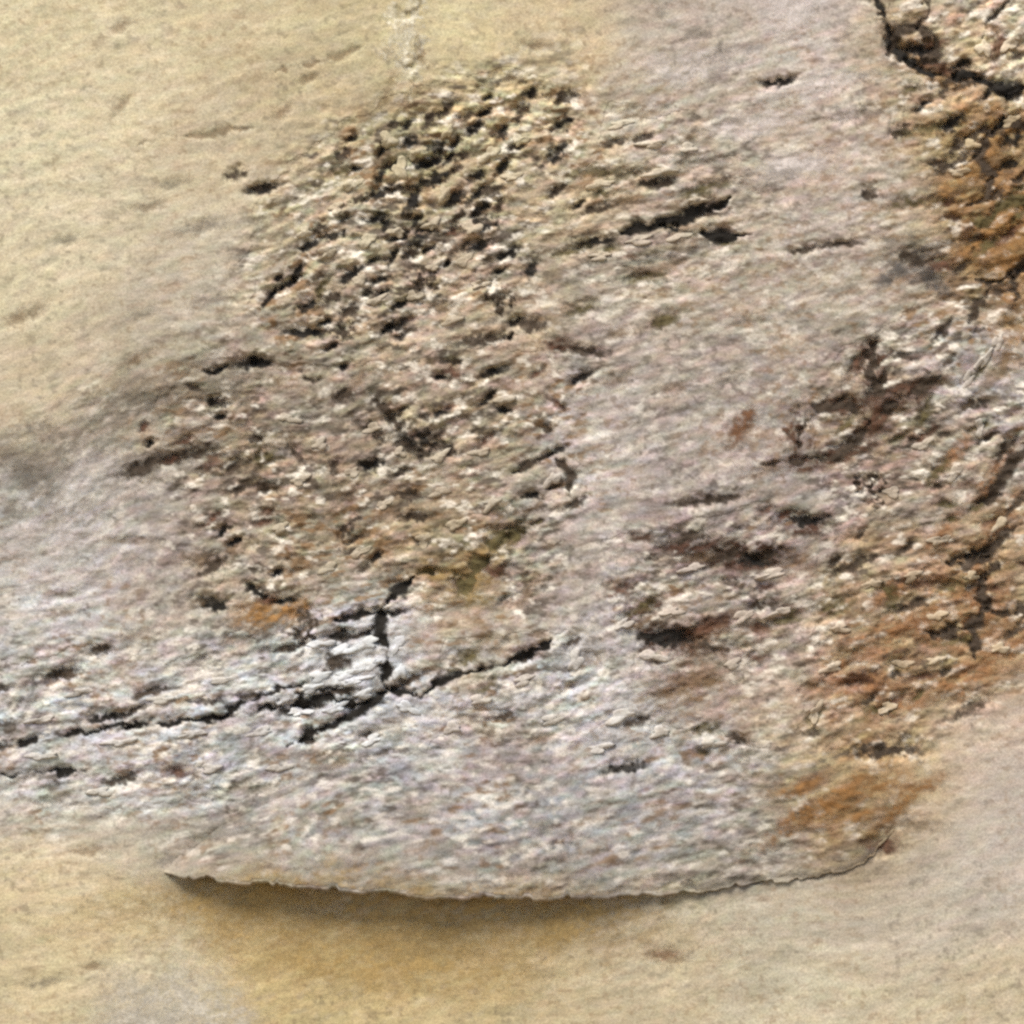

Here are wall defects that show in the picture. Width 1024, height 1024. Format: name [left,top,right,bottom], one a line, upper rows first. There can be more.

crack [875,0,1024,228]
crack [65,520,551,743]
rust [863,611,925,643]
rust [832,658,886,694]
crack [19,737,38,747]
crack [48,767,77,778]
rust [780,775,932,832]